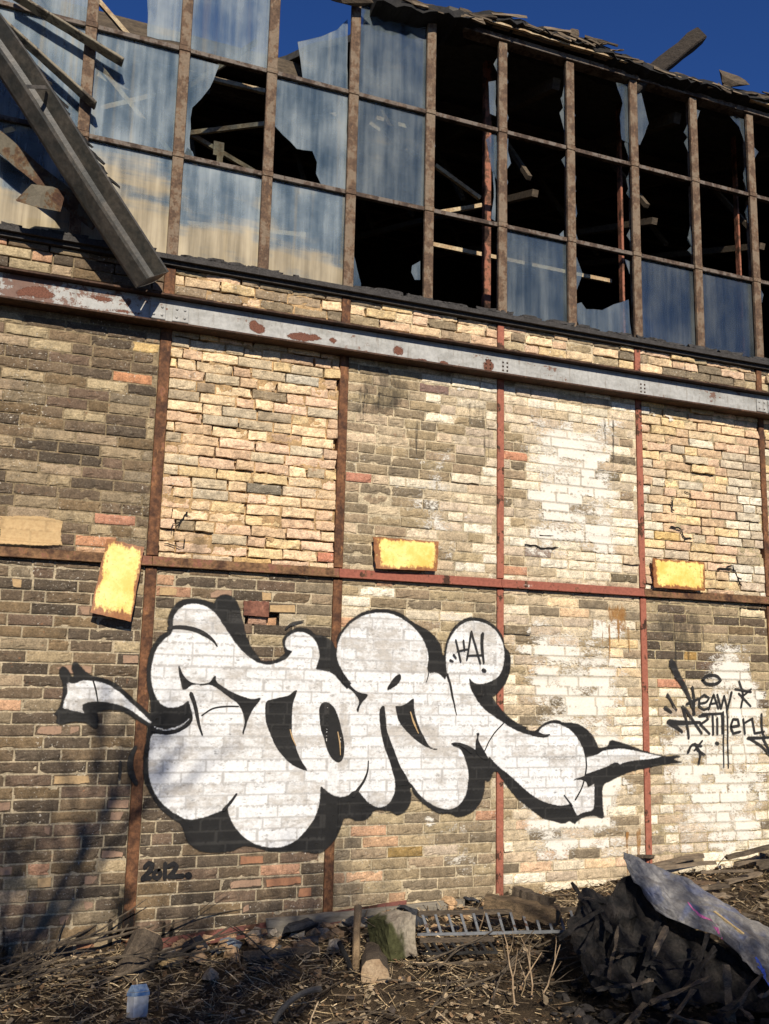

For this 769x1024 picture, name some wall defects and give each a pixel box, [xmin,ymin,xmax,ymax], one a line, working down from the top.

crack [164,512,188,548]
crack [525,535,559,550]
crack [670,491,695,541]
crack [717,565,742,586]
rust [602,607,630,659]